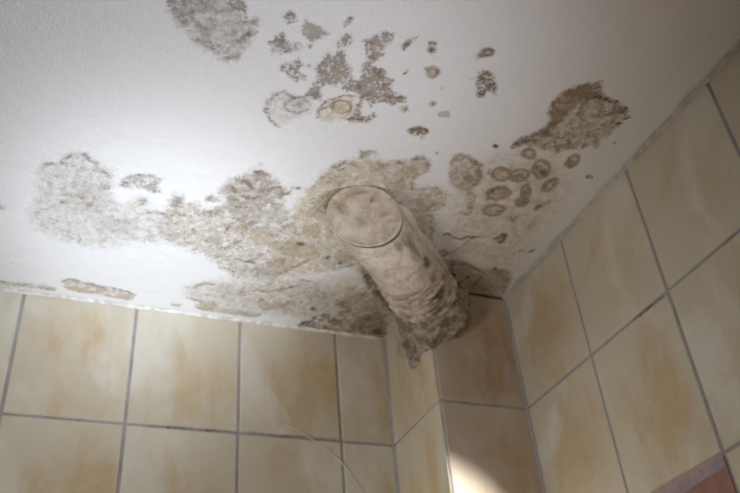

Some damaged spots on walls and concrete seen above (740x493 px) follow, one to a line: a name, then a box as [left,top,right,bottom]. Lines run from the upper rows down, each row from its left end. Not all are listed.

leakage [174,0,257,57]
leakage [268,33,291,53]
leakage [280,61,303,81]
leakage [293,17,407,122]
leakage [483,84,630,220]
leakage [161,151,445,337]
peeling [0,279,133,300]